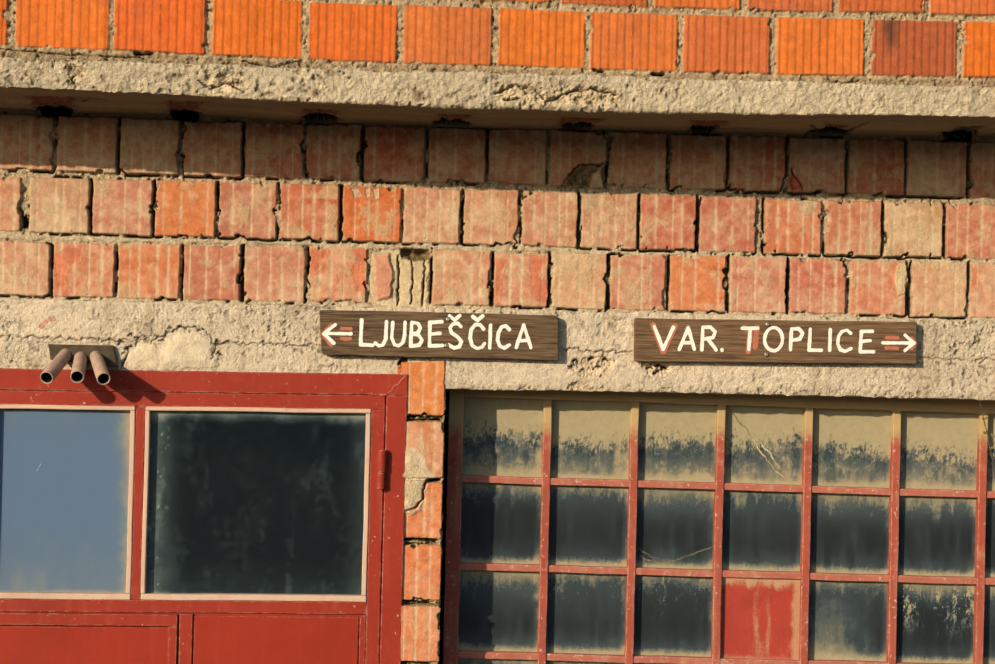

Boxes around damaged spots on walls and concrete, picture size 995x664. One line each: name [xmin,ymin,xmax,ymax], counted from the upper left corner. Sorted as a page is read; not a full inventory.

peeling [403,445,441,516]